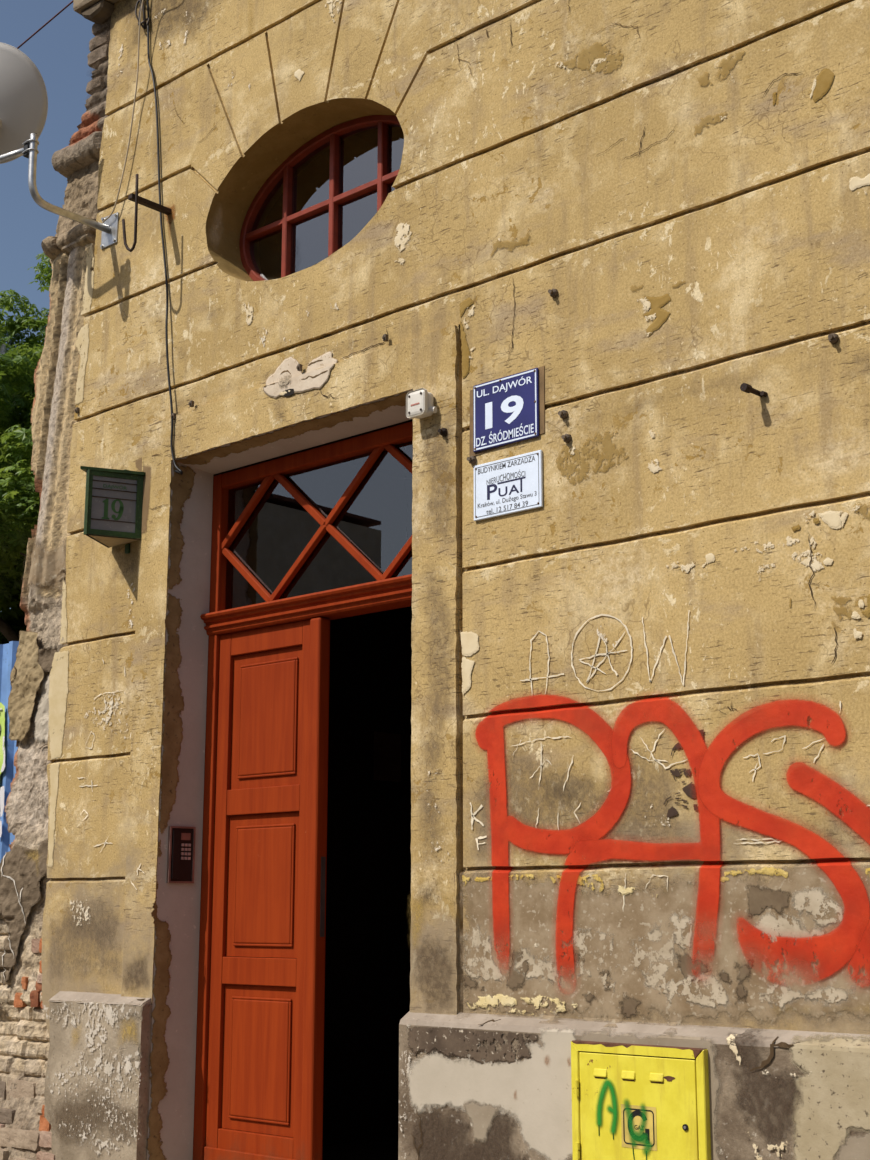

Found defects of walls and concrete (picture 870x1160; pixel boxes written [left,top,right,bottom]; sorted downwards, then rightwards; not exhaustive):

peeling [556,41,626,93]
peeling [810,68,835,102]
flaking render [263,330,338,398]
peeling [157,393,407,864]
crack [808,538,821,608]
peeling [831,594,870,639]
peeling [0,838,48,1010]
flaking render [454,859,870,1028]
peeling [147,883,172,1160]
flaking render [790,1035,870,1160]